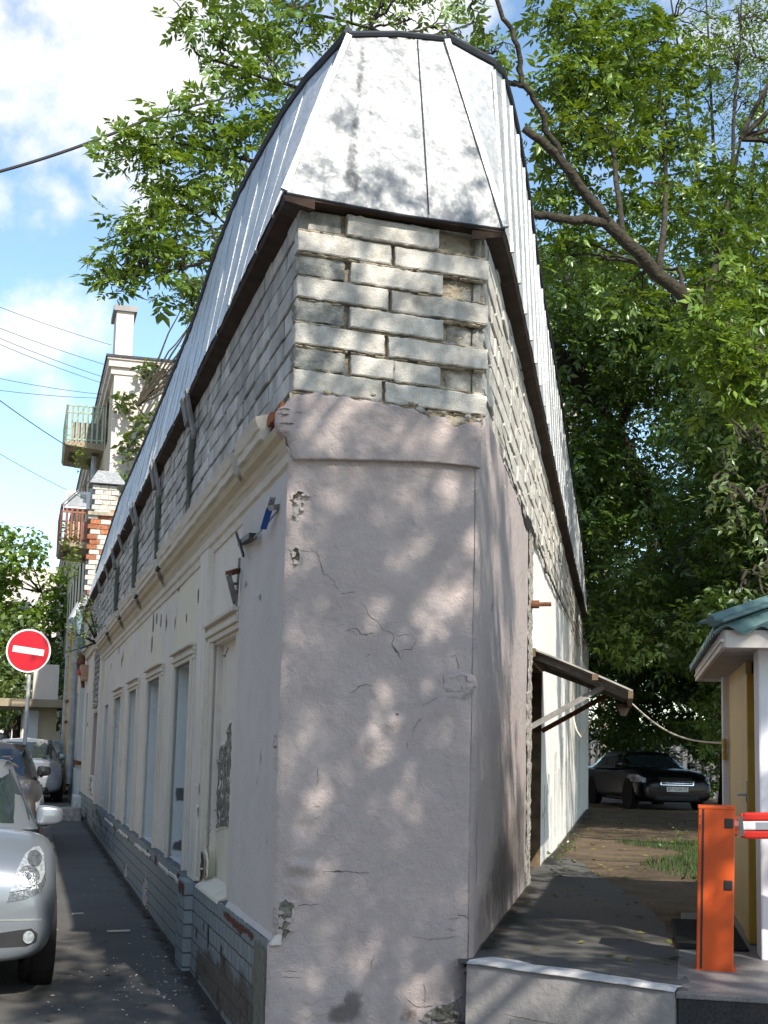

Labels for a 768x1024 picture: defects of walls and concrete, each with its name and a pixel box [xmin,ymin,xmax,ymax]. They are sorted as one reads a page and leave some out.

flaking render [290,490,311,521]
flaking render [288,544,302,566]
crack [301,550,416,662]
flaking render [214,720,233,833]
rust [223,911,253,941]
flaking render [274,896,298,943]